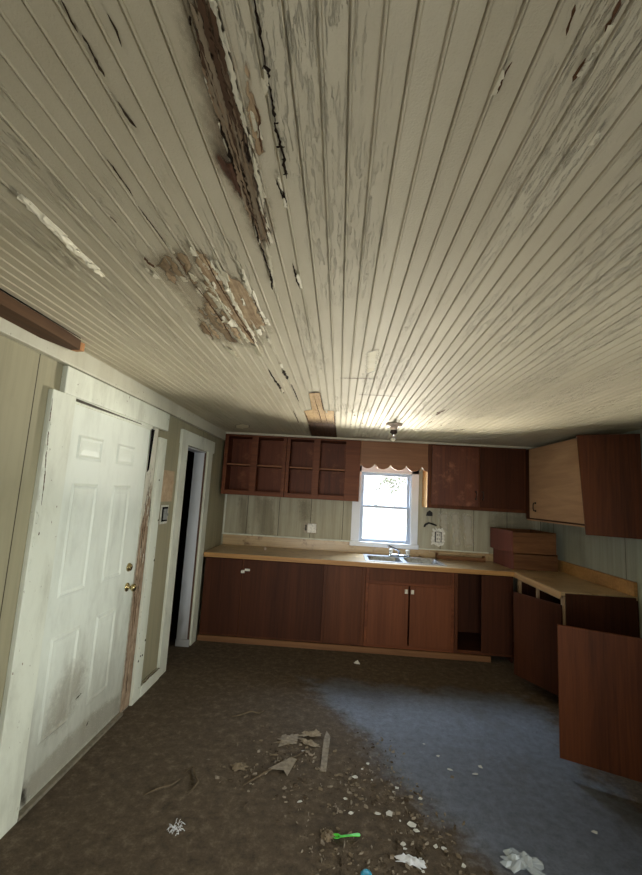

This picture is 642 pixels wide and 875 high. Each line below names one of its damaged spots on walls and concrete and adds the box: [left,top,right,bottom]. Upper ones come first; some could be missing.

crack [61,0,105,77]
crack [108,15,122,47]
crack [118,102,136,127]
peeling [189,0,275,290]
crack [254,0,288,209]
peeling [491,62,512,96]
peeling [572,0,621,82]
peeling [143,235,299,401]
peeling [293,392,337,439]